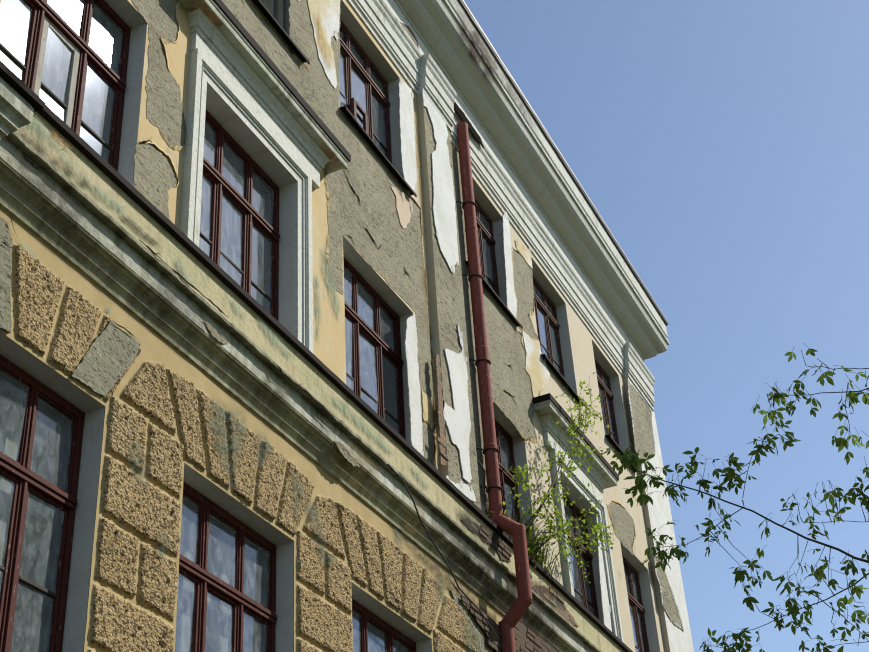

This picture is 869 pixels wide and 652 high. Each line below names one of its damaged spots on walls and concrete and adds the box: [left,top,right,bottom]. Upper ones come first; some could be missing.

water stain [29,120,57,147]
peeling [131,0,188,221]
water stain [86,176,157,244]
peeling [222,0,489,509]
peeling [203,321,229,344]
water stain [260,322,289,355]
peeling [482,211,550,444]
peeling [628,380,655,465]
spalling [461,518,512,562]
spalling [461,595,502,652]
spalling [514,619,558,652]
spalling [532,585,579,627]